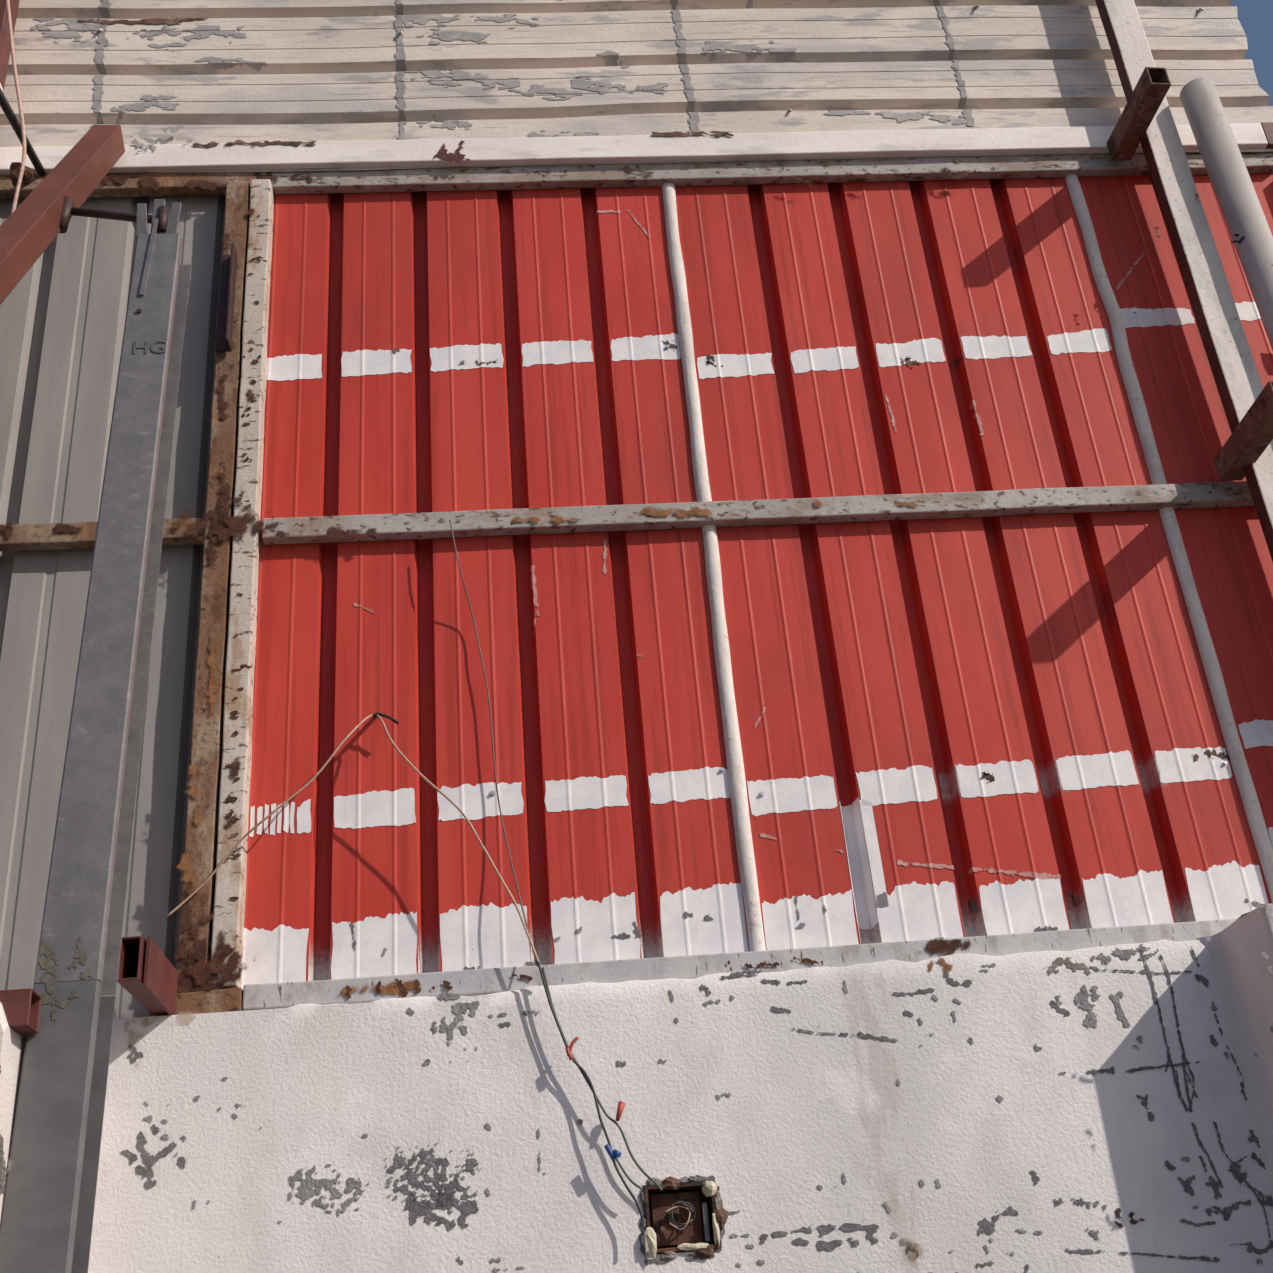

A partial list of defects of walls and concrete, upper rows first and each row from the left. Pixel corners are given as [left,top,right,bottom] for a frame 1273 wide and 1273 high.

corrosion [225,757,241,861]
corrosion [175,854,255,993]
corrosion [341,977,453,999]
corrosion [727,956,823,971]
corrosion [926,939,971,978]
peeling [1044,944,1158,1050]
crack [1096,946,1271,1243]
peeling [288,1164,369,1216]
peeling [386,1142,490,1231]
peeling [1165,1130,1273,1227]
peeling [976,1206,1042,1267]
crack [1119,1252,1220,1262]